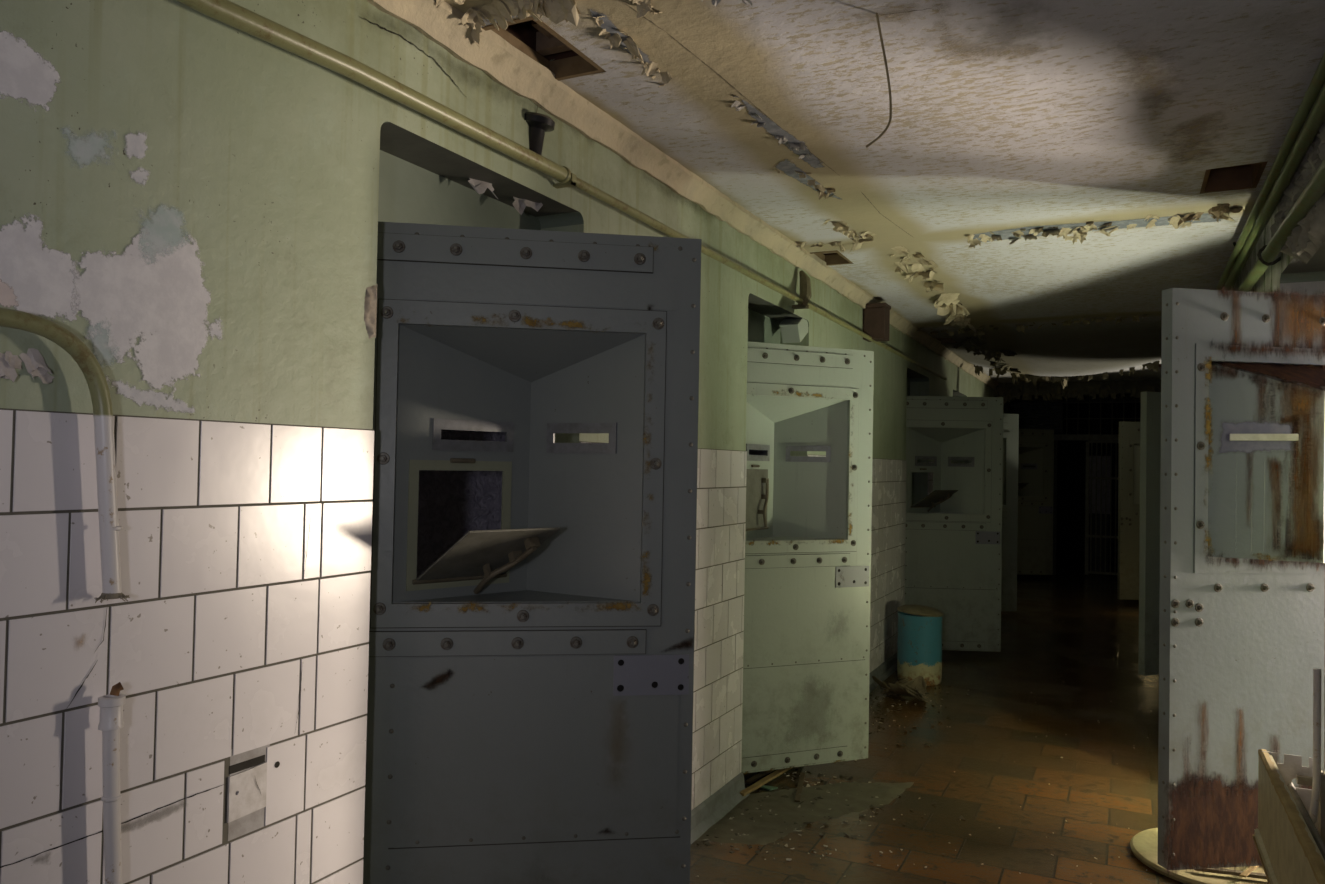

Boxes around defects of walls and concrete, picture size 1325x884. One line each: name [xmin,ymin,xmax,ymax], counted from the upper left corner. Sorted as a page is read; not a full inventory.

peeling [0,31,60,112]
peeling [436,0,672,87]
peeling [63,128,149,185]
peeling [794,219,876,253]
peeling [967,203,1246,248]
peeling [0,205,222,413]
peeling [889,246,1160,389]
rust [1204,285,1325,570]
rust [1163,704,1263,873]